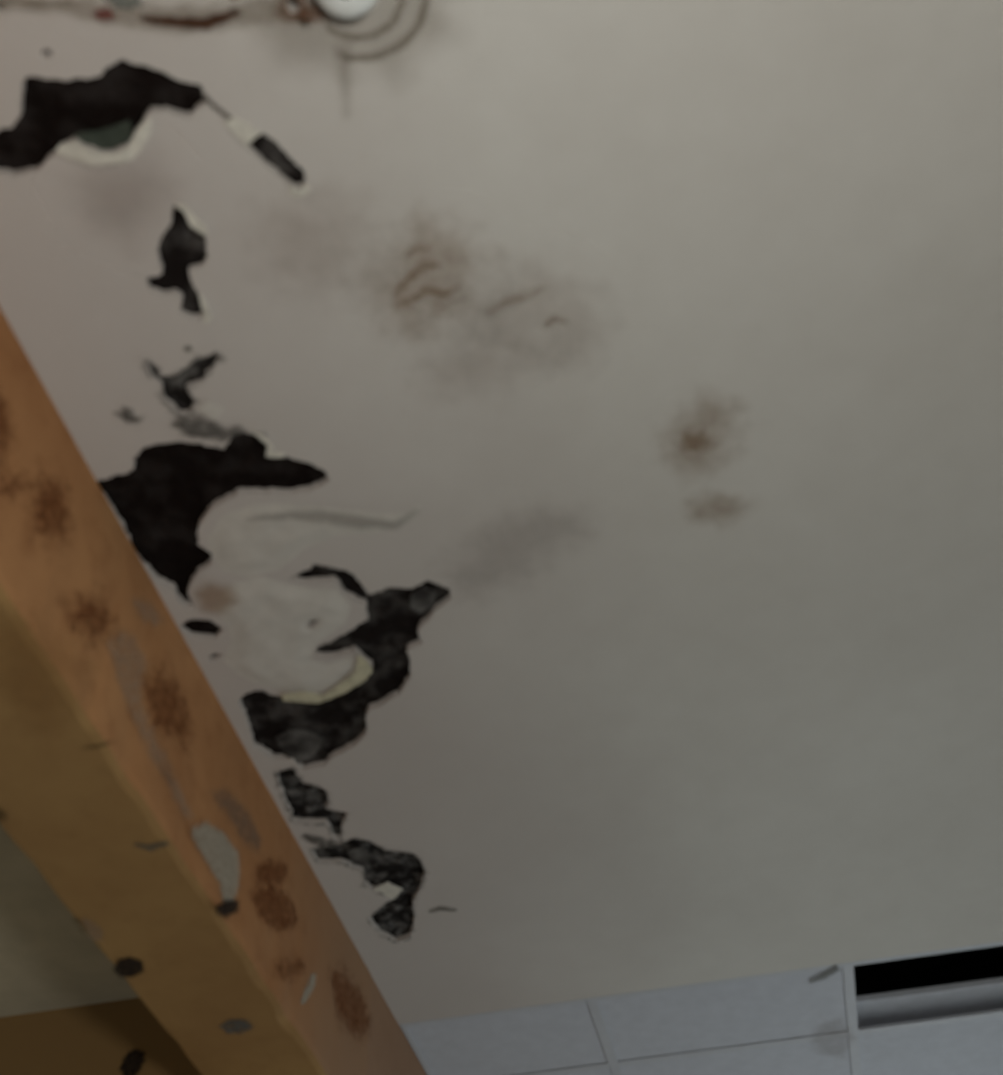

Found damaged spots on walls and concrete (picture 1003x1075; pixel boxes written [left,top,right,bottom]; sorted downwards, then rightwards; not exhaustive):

corrosion [93,0,240,29]
spalling [0,59,204,171]
spalling [224,117,310,197]
spalling [148,204,212,325]
spalling [97,353,327,601]
spalling [182,619,221,634]
spalling [241,564,450,942]